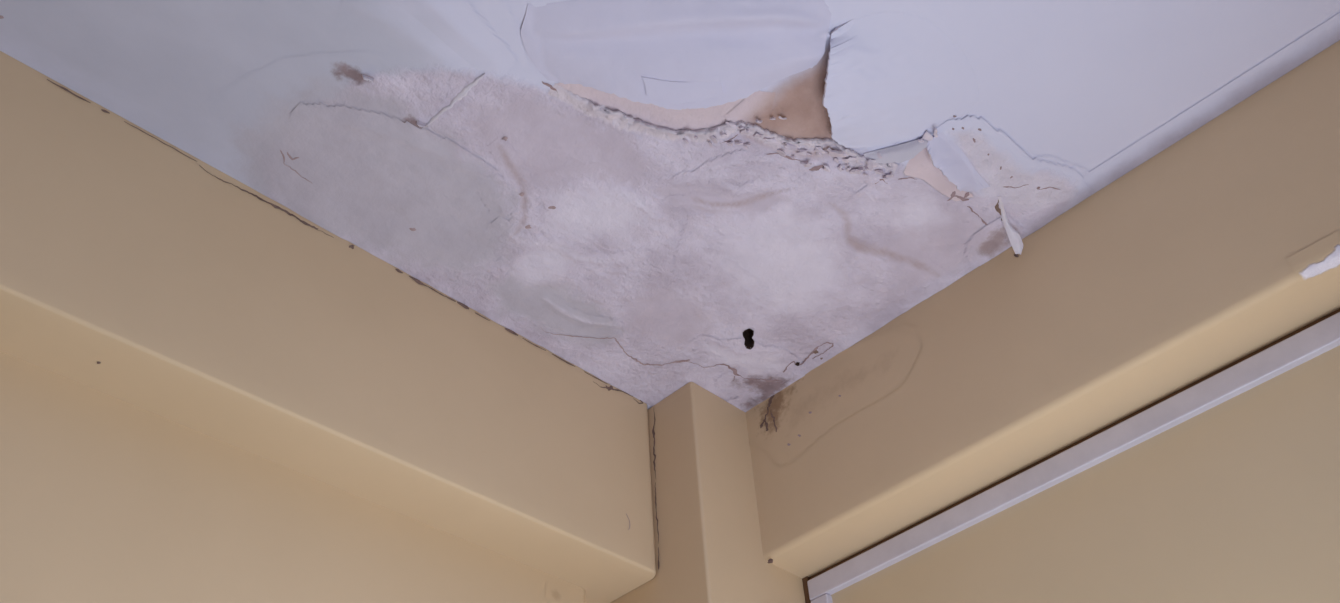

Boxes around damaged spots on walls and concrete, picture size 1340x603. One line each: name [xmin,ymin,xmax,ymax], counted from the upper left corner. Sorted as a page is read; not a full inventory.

peeling [316,53,388,96]
peeling [389,109,434,130]
flaking render [510,59,972,206]
damp [0,0,1024,467]
crack [395,269,781,384]
flaking render [754,294,919,375]
flaking render [548,348,738,407]